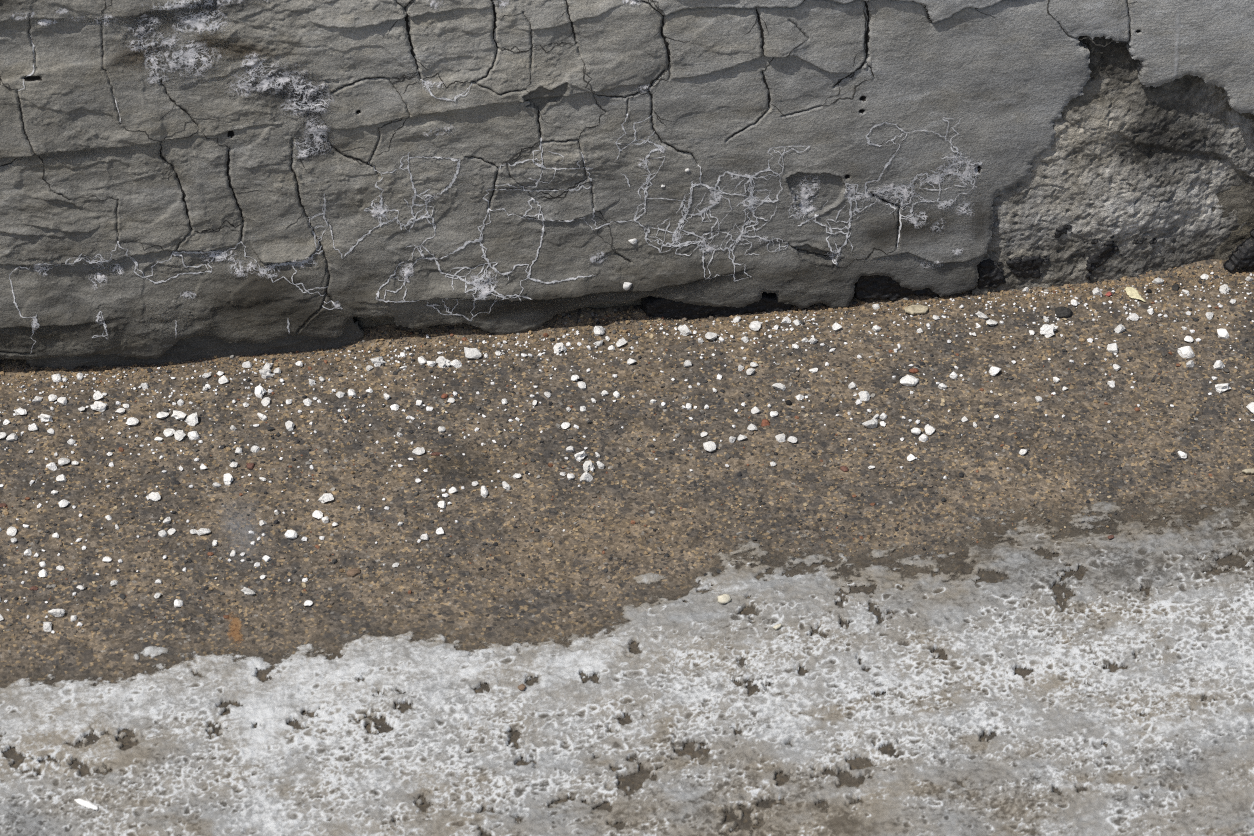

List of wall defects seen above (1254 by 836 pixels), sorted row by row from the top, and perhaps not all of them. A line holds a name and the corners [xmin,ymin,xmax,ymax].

damp [12,8,113,91]
crack [0,0,258,253]
damp [125,0,330,158]
crack [285,0,697,332]
damp [9,114,982,354]
crack [726,0,932,141]
crack [790,193,900,268]
crack [1047,0,1137,47]
flaking render [972,36,1254,295]